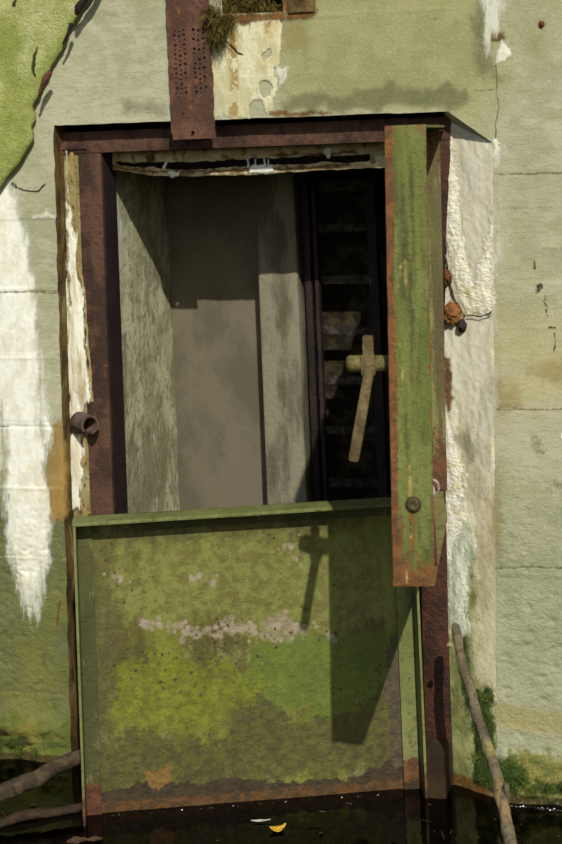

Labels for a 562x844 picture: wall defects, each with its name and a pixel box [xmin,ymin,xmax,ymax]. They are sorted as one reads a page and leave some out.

peeling [212,19,287,119]
crack [476,63,500,139]
leakage [481,0,511,63]
leakage [0,176,53,621]
rust [69,152,94,402]
leakage [445,133,501,636]